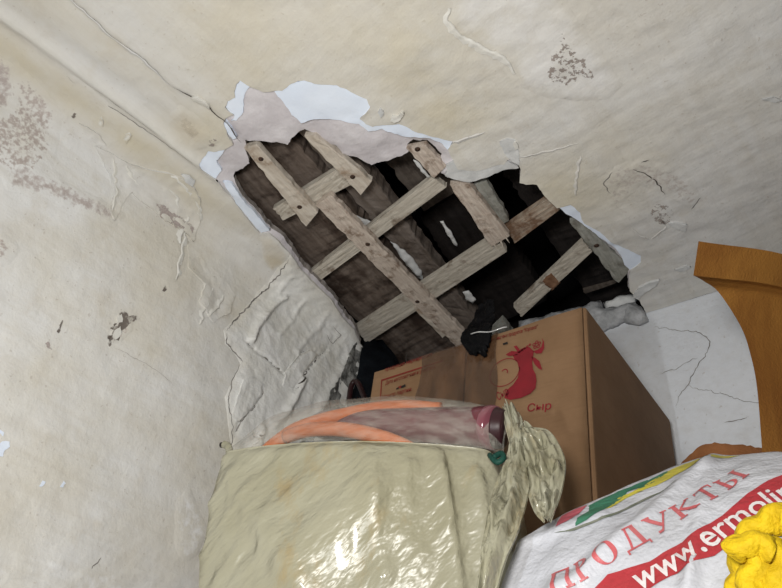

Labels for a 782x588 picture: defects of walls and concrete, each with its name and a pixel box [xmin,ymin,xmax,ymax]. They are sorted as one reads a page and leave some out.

crack [70,0,238,146]
water stain [548,38,594,85]
spalling [106,309,138,348]
spalling [199,80,521,410]
spalling [518,205,649,332]
crack [655,326,756,422]